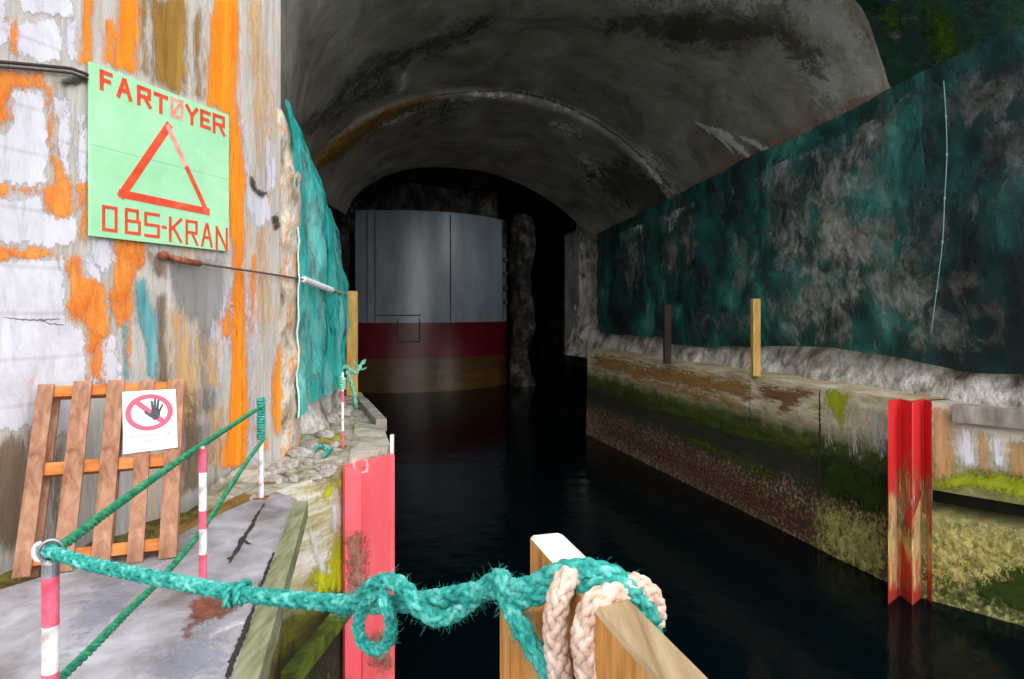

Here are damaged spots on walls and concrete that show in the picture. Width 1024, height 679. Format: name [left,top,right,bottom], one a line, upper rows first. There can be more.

rust [312,96,436,170]
peeling [0,0,123,438]
crack [2,317,63,325]
efflorescence [848,402,887,458]
rust [182,596,238,639]
crack [225,504,275,678]